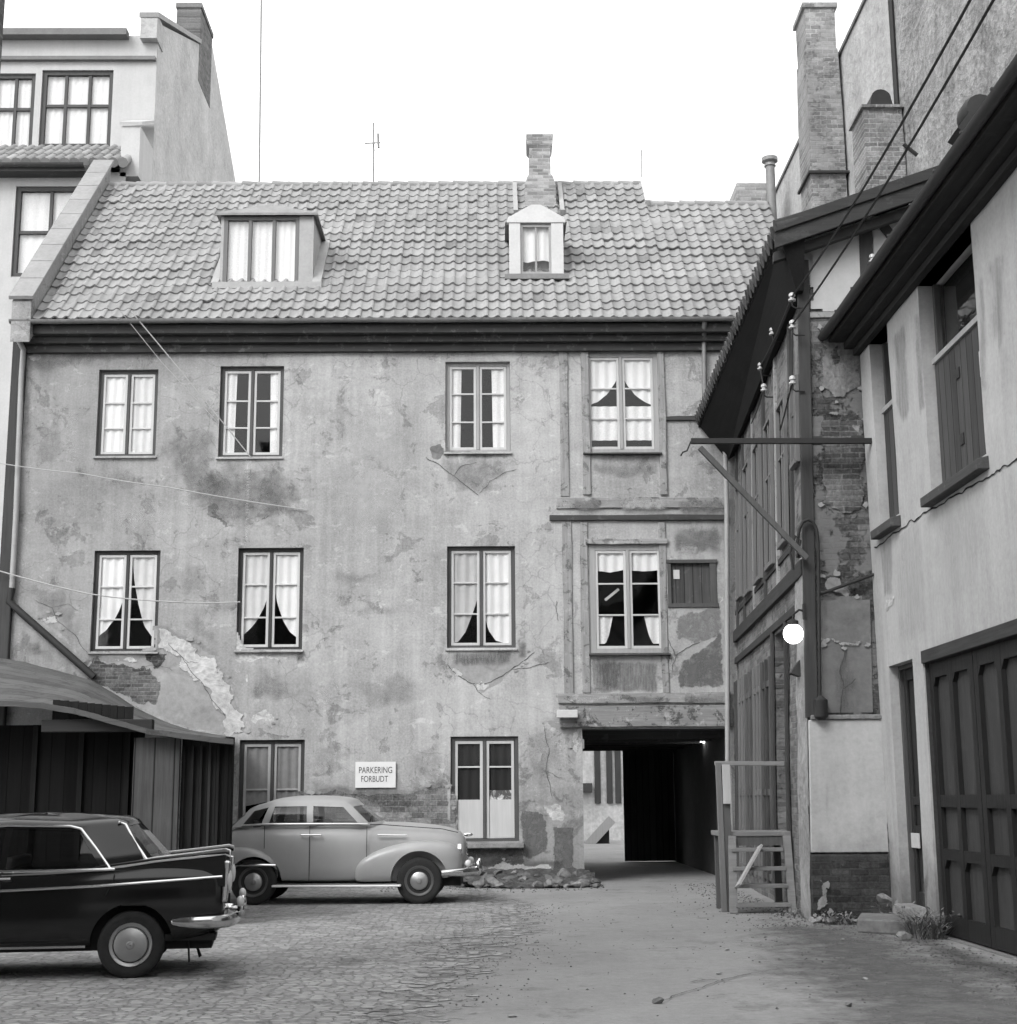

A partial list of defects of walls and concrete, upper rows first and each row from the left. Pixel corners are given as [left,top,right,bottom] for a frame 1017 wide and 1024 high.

flaking render [817,324,869,513]
crack [428,459,516,495]
flaking render [820,569,860,599]
flaking render [37,610,71,646]
flaking render [83,626,278,736]
crack [448,652,540,699]
damp [676,607,723,702]
crack [839,650,855,714]
damp [467,811,573,870]